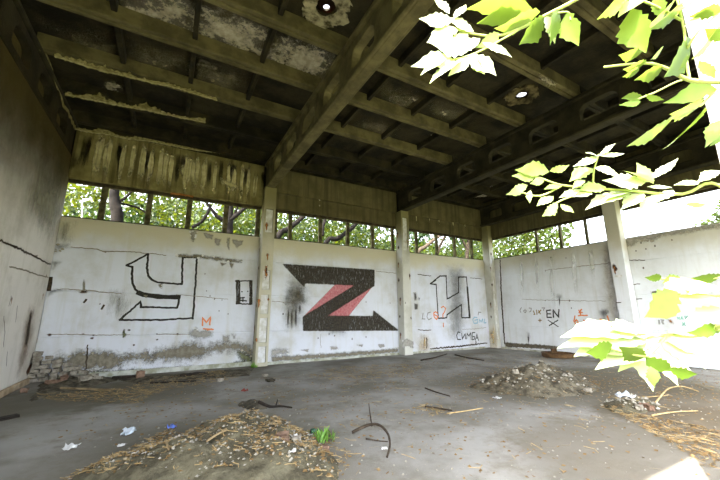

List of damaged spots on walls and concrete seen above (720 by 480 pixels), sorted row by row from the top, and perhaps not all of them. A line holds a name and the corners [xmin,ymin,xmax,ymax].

water stain [272,40,327,74]
water stain [39,49,265,192]
crack [0,239,121,294]
peeling [175,253,242,268]
water stain [21,314,32,375]
peeling [29,327,253,385]